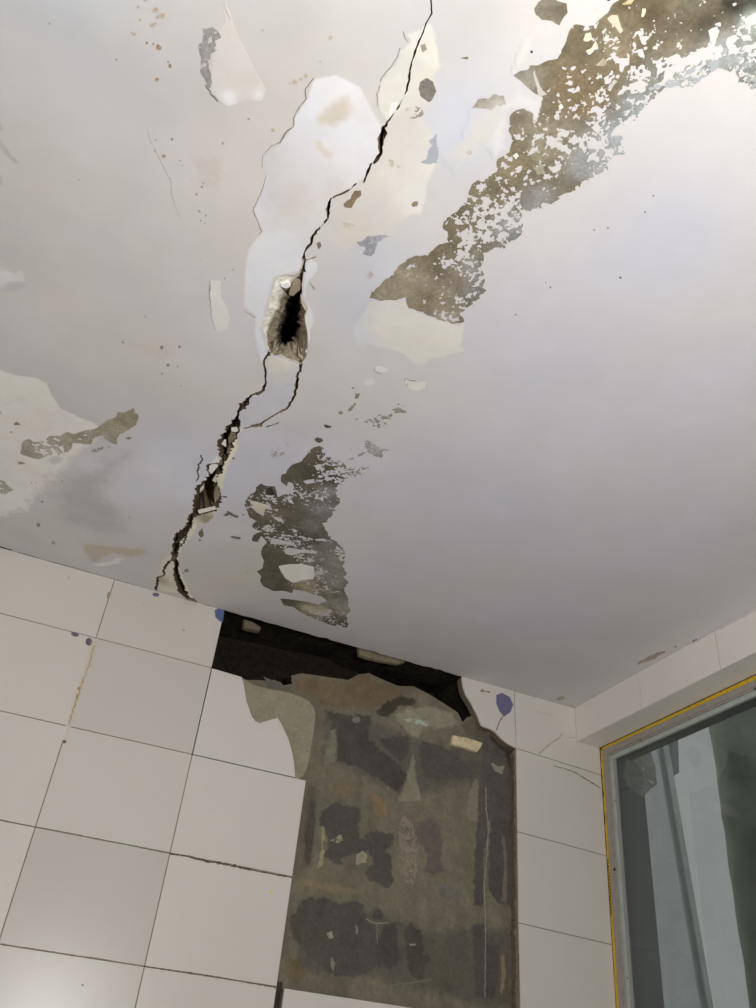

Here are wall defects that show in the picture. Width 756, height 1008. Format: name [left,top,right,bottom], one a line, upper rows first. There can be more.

peeling [198,2,265,106]
crack [300,0,433,271]
peeling [239,0,756,428]
peeling [0,369,139,521]
crack [19,340,303,602]
peeling [224,425,389,628]
spalling [211,610,471,722]